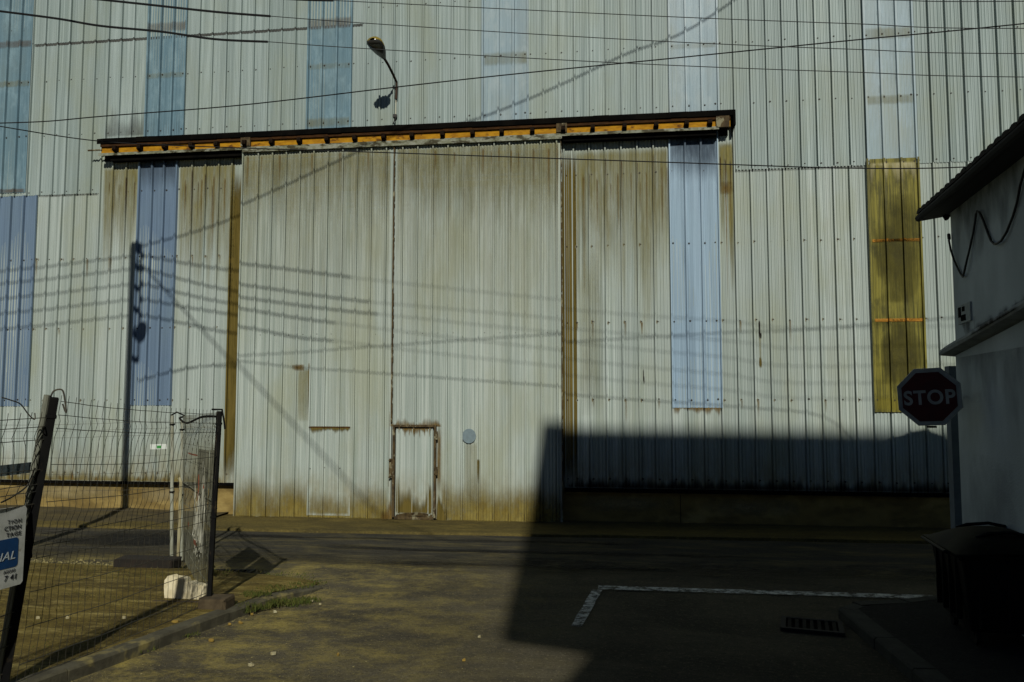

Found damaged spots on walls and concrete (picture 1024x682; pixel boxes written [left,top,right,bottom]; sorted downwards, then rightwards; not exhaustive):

corrosion [181,165,241,468]
corrosion [472,144,667,473]
corrosion [719,144,733,250]
corrosion [382,422,446,521]